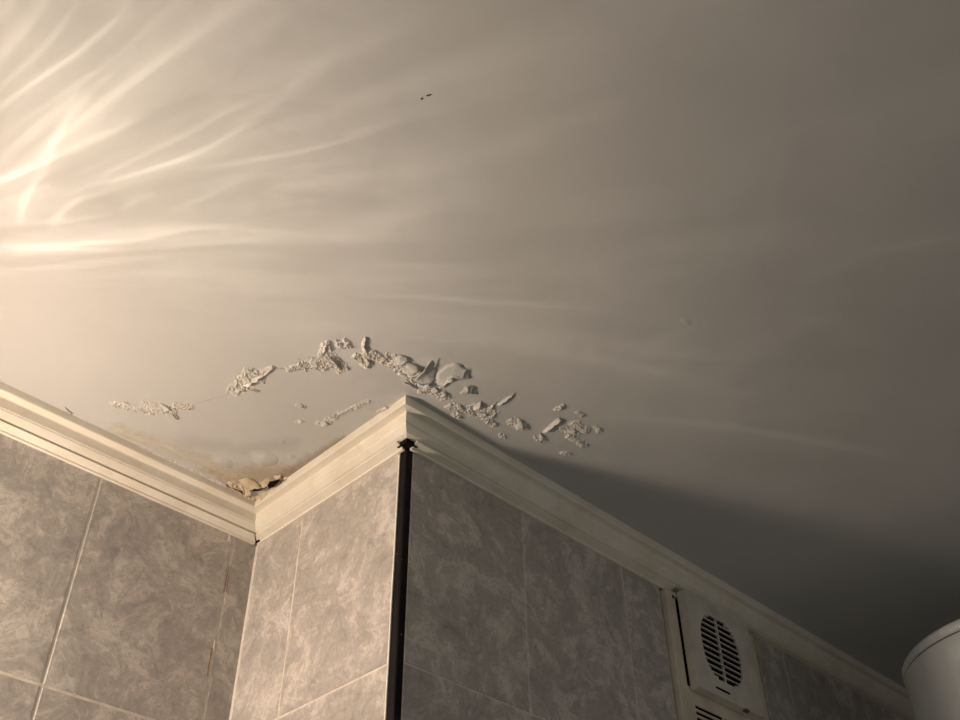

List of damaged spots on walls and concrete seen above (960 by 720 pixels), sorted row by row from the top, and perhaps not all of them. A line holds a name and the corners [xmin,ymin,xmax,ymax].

peeling [109,399,195,420]
peeling [224,337,603,455]
flaking render [137,445,288,502]